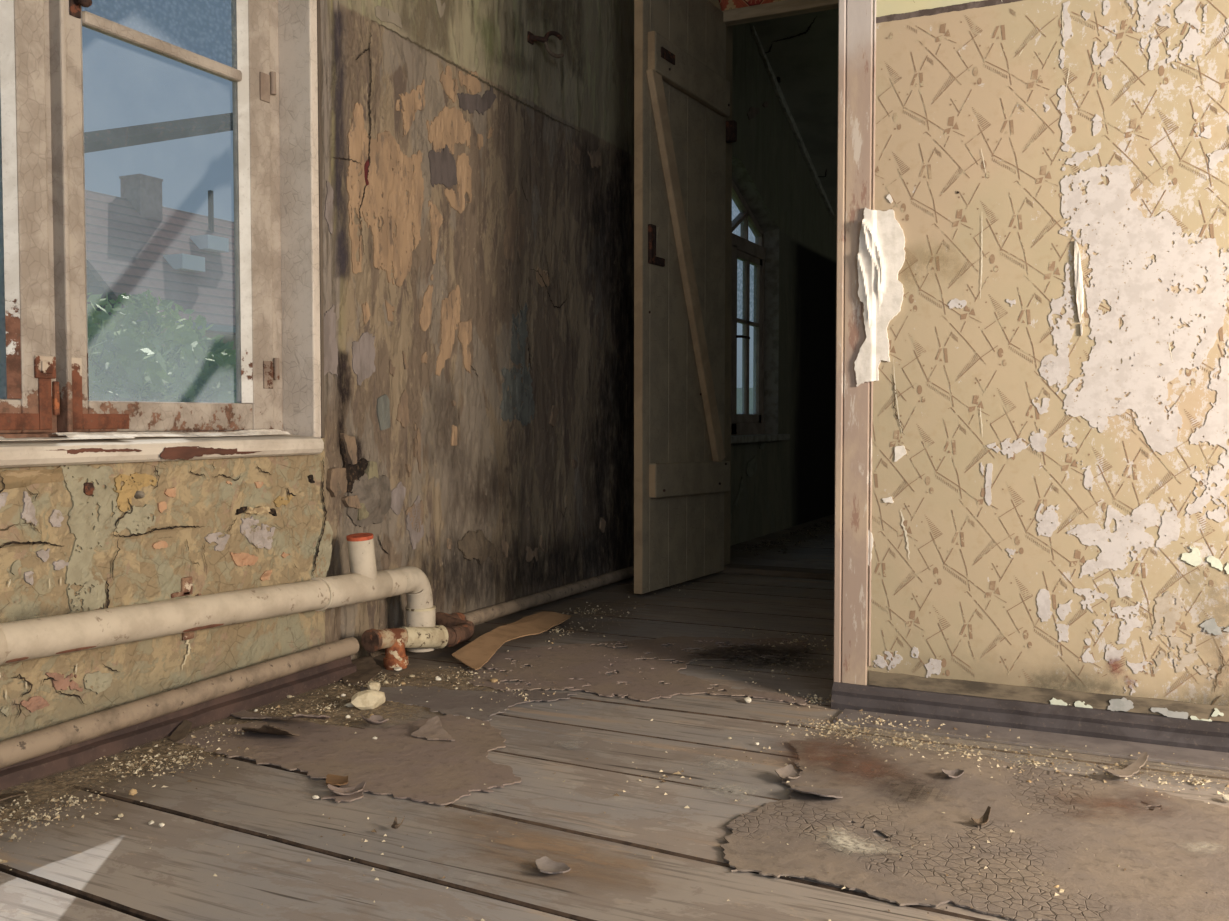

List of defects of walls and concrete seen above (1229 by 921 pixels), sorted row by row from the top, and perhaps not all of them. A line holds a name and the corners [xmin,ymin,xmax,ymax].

peeling [1127,0,1208,71]
peeling [1044,85,1072,152]
peeling [323,66,497,386]
spalling [1074,240,1084,336]
flaking render [339,438,369,494]
crack [0,474,63,548]
crack [103,498,259,609]
crack [190,460,327,576]
crack [11,674,84,717]
flaking render [1049,698,1092,708]
flaking render [1081,614,1151,712]
flaking render [1150,707,1224,721]